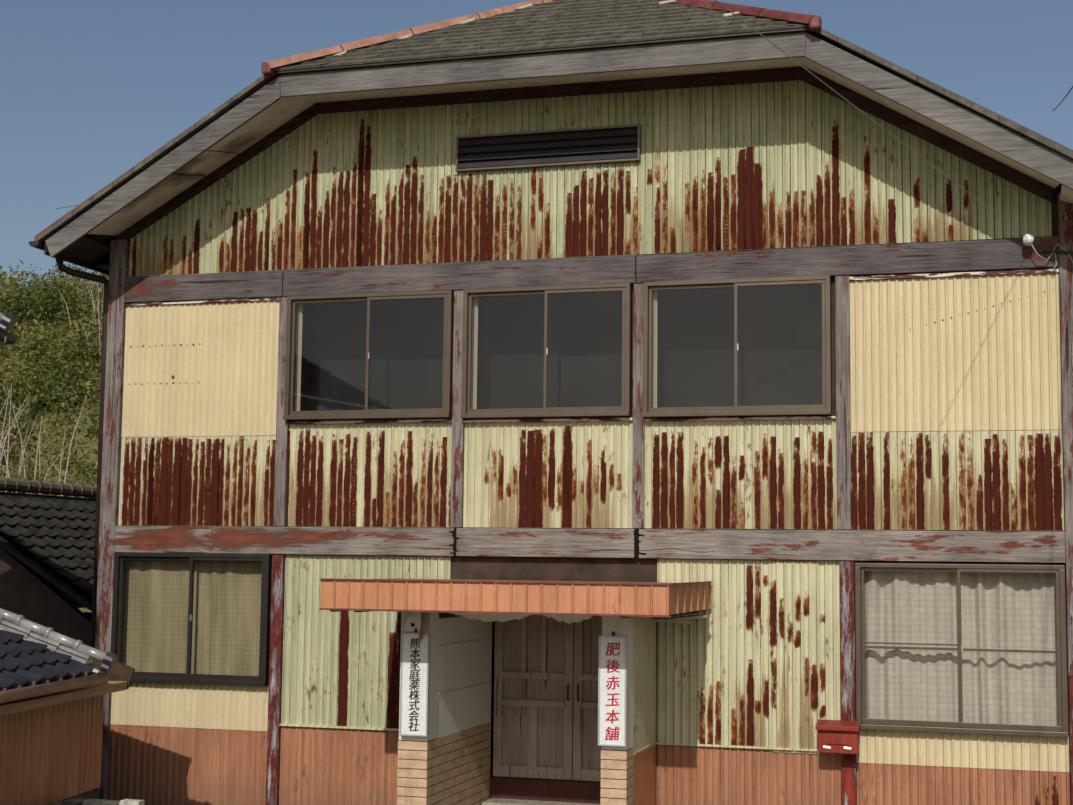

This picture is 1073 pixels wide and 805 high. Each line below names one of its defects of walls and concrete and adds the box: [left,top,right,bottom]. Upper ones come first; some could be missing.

rust [219,119,550,273]
rust [565,120,896,257]
rust [121,429,451,527]
rust [652,431,833,529]
rust [851,432,1063,530]
peeling [782,541,820,551]
peeling [894,534,985,554]
peeling [998,535,1061,548]
rust [699,565,826,746]
peeling [840,566,853,712]
peeling [267,651,278,805]
peeling [842,754,856,805]